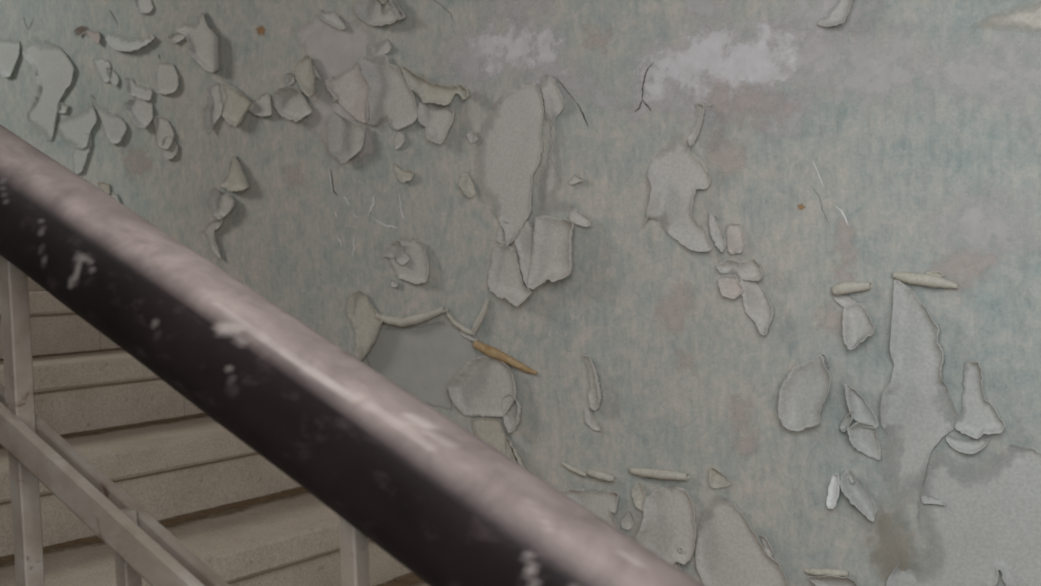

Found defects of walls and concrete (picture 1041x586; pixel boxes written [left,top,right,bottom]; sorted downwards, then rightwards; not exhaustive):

peeling [0,40,179,174]
peeling [74,0,470,164]
crack [634,63,653,113]
peeling [986,3,1041,31]
peeling [203,154,250,259]
peeling [346,74,591,468]
peeling [642,138,775,335]
peeling [778,271,1041,586]
peeling [561,462,788,586]